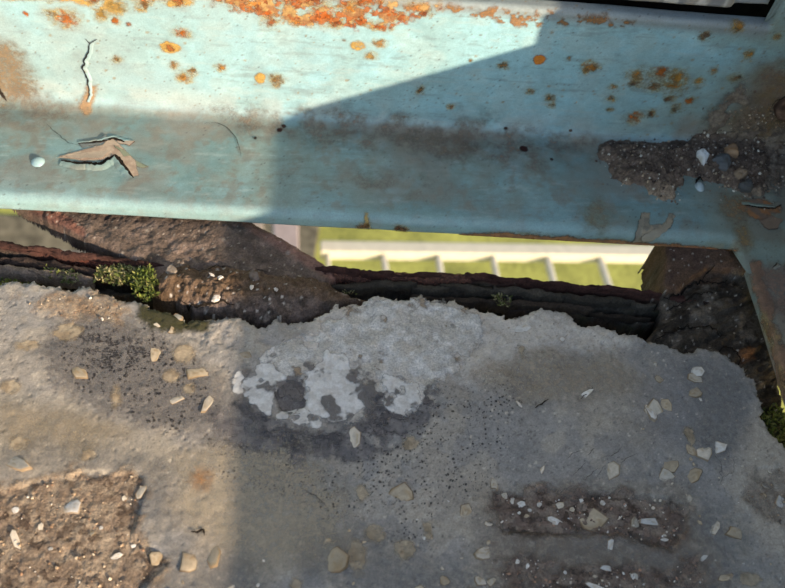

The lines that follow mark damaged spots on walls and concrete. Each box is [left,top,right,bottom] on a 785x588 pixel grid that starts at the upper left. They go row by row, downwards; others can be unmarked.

corrosion [47,0,131,28]
corrosion [216,0,463,59]
corrosion [472,7,542,27]
corrosion [548,10,632,27]
crack [80,39,97,115]
corrosion [160,30,196,82]
corrosion [255,73,281,87]
corrosion [630,68,686,112]
peeling [58,135,148,180]
peeling [632,212,675,243]
corrosion [749,260,785,401]
leakage [48,316,635,573]